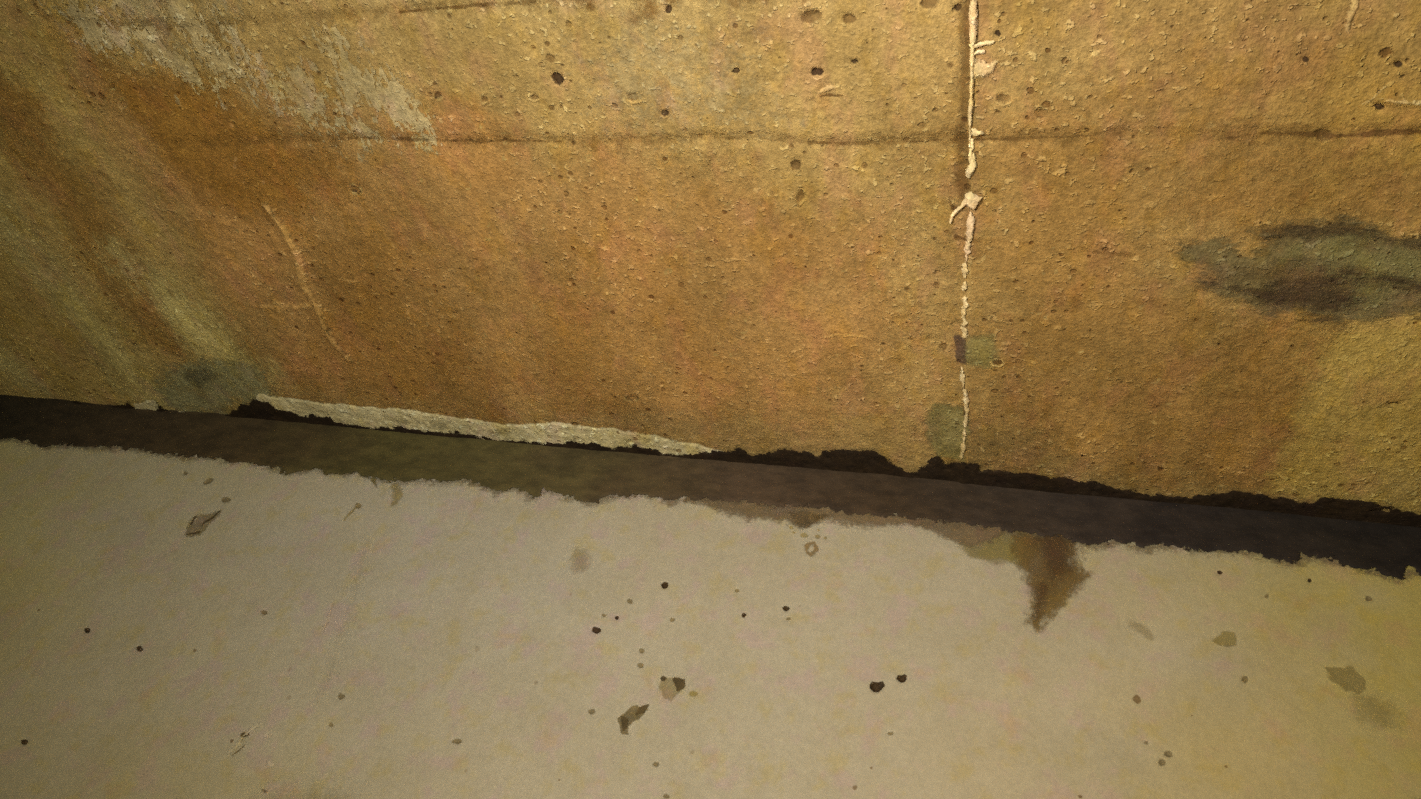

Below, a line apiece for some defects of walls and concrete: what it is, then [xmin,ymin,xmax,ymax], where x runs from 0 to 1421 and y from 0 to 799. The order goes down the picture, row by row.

crack [402,136,549,144]
crack [1261,128,1421,138]
crack [910,0,1067,458]
leakage [949,118,1421,514]
leakage [919,388,970,461]
leakage [789,511,828,556]
leakage [963,530,1089,630]